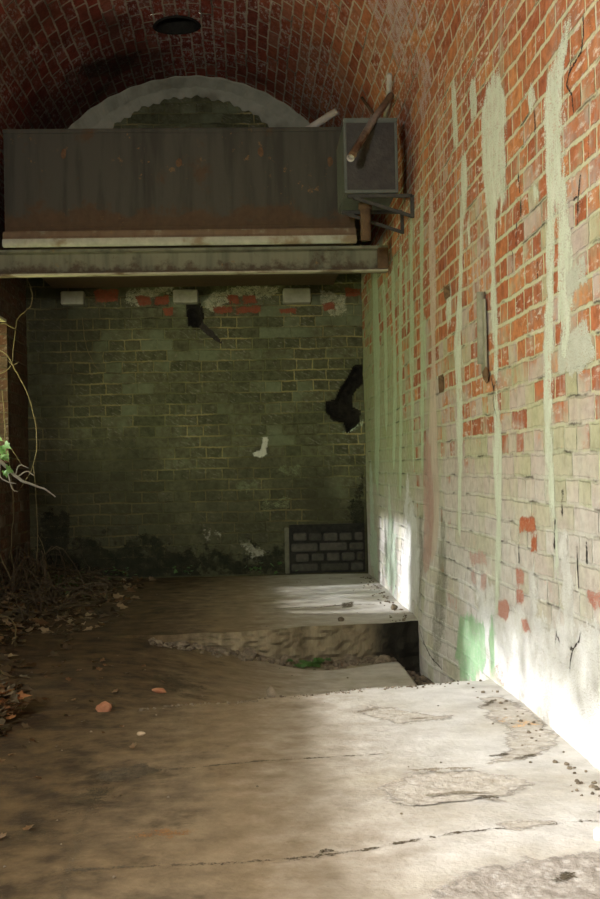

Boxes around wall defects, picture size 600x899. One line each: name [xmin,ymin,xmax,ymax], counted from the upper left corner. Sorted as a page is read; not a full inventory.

crack [566,16,584,113]
peeling [93,287,174,316]
peeling [186,286,279,343]
spalling [326,364,363,434]
water stain [346,151,471,667]
water stain [472,13,600,768]
water stain [32,508,285,578]
crack [555,631,580,665]
spalling [379,697,559,806]
spalling [431,849,600,899]